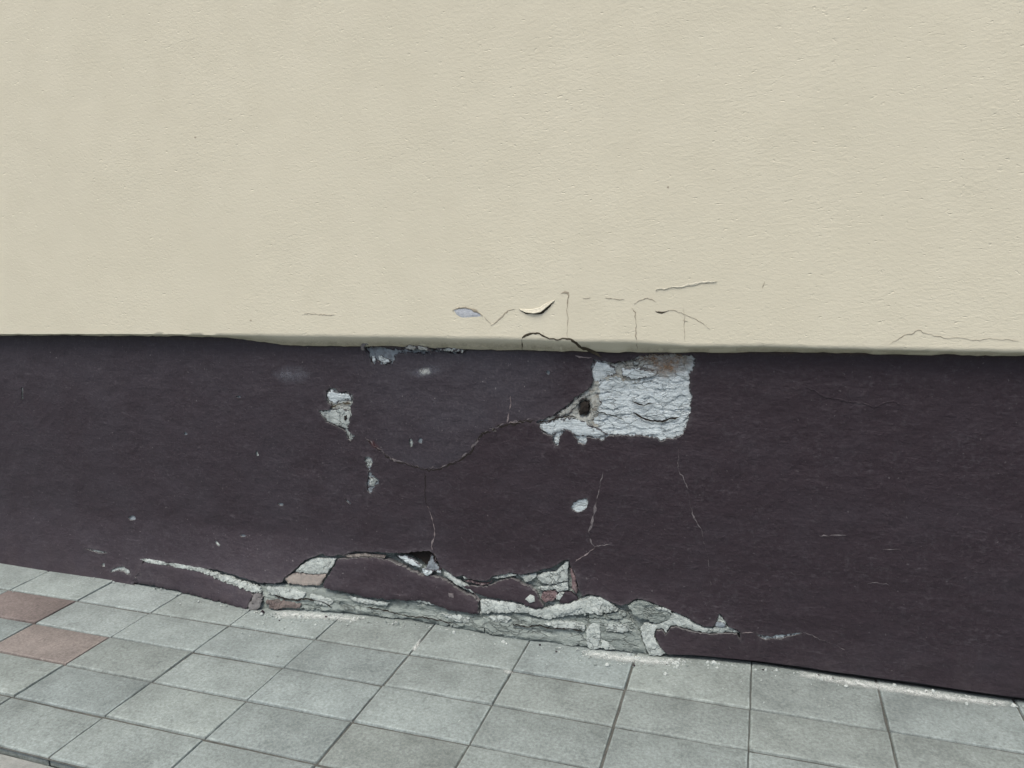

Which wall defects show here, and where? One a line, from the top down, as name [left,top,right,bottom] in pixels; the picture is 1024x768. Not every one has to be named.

peeling [360,343,468,365]
crack [521,291,709,358]
peeling [320,388,355,440]
peeling [537,353,696,445]
peeling [365,457,379,493]
crack [365,396,545,609]
peeling [571,498,588,512]
crack [576,474,610,561]
spalling [205,551,740,656]